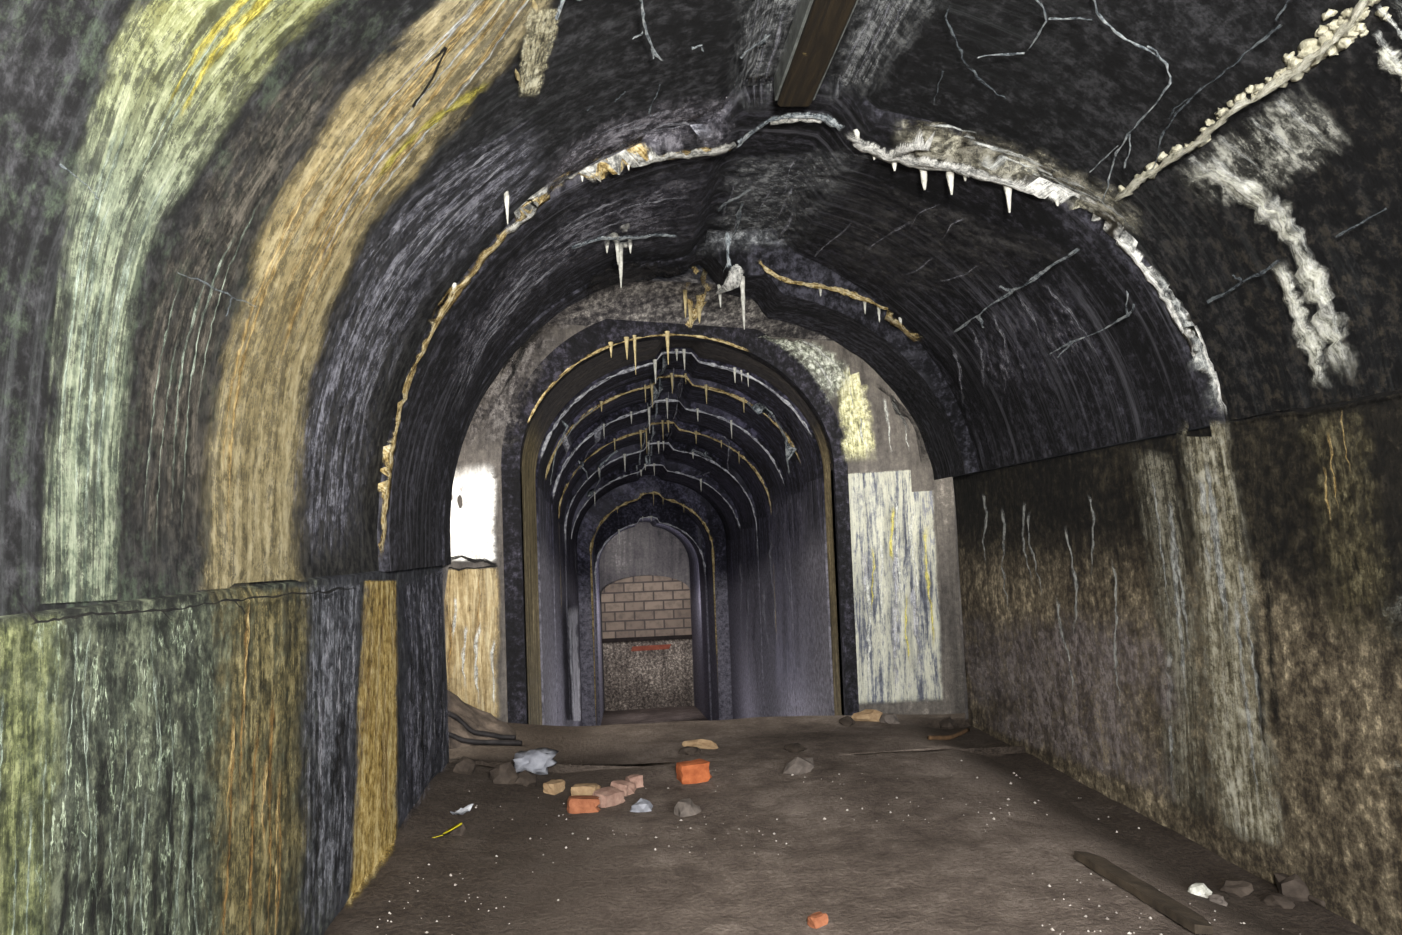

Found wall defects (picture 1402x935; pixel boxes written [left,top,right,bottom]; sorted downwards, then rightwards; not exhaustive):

crack [587,0,704,115]
crack [740,34,770,59]
crack [934,0,1289,201]
damp [12,0,330,935]
damp [528,155,943,721]
damp [145,0,1402,601]
damp [303,586,362,912]
damp [399,570,451,815]
damp [967,424,1281,843]